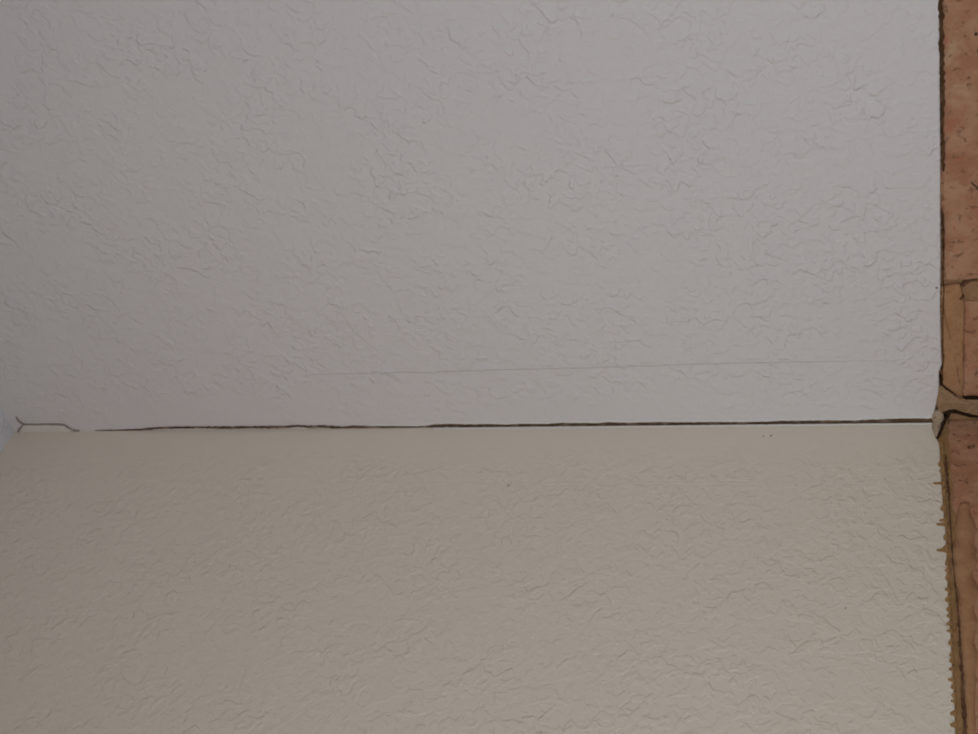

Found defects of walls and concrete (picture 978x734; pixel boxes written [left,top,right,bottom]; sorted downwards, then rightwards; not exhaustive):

crack [95,210,978,734]